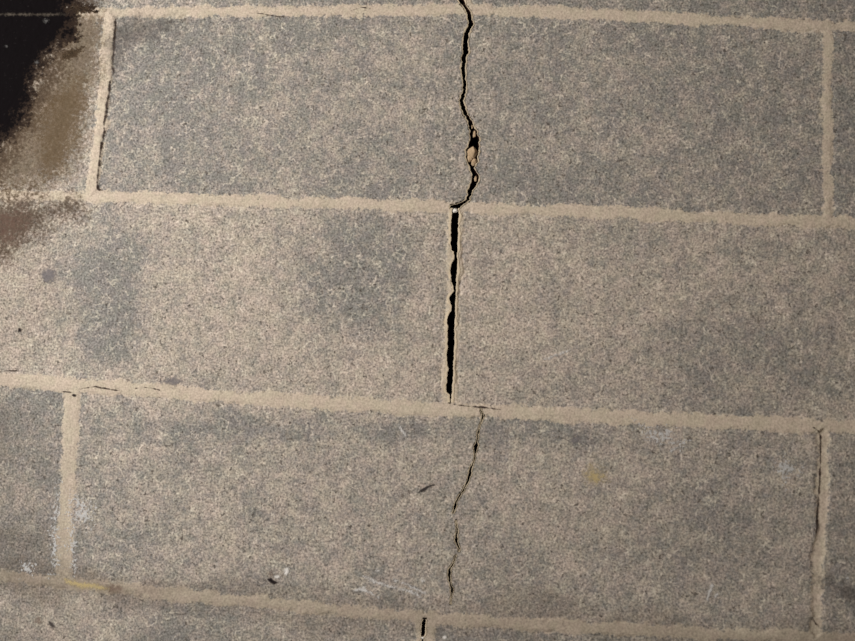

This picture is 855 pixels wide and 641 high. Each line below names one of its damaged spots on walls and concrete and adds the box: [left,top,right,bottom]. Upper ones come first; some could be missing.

crack [443,0,500,605]
crack [419,618,427,641]